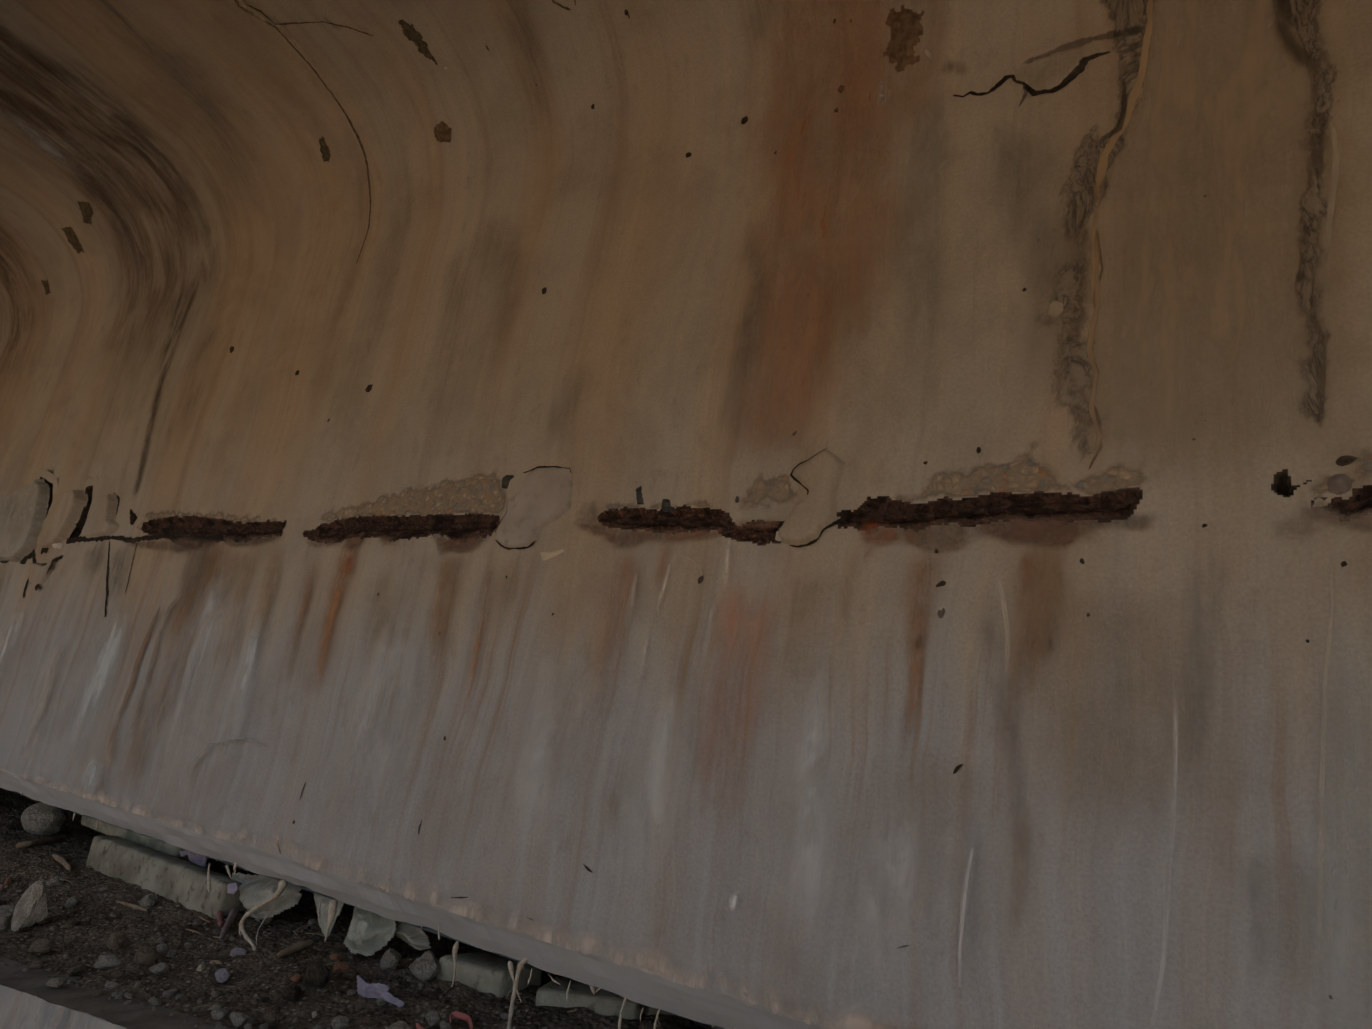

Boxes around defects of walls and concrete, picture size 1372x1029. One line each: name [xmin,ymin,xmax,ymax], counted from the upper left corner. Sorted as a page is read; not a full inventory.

crack [953,51,1111,107]
crack [234,0,373,264]
spalling [128,473,514,556]
spalling [581,475,796,558]
spalling [821,444,1163,553]
spalling [1290,454,1372,538]